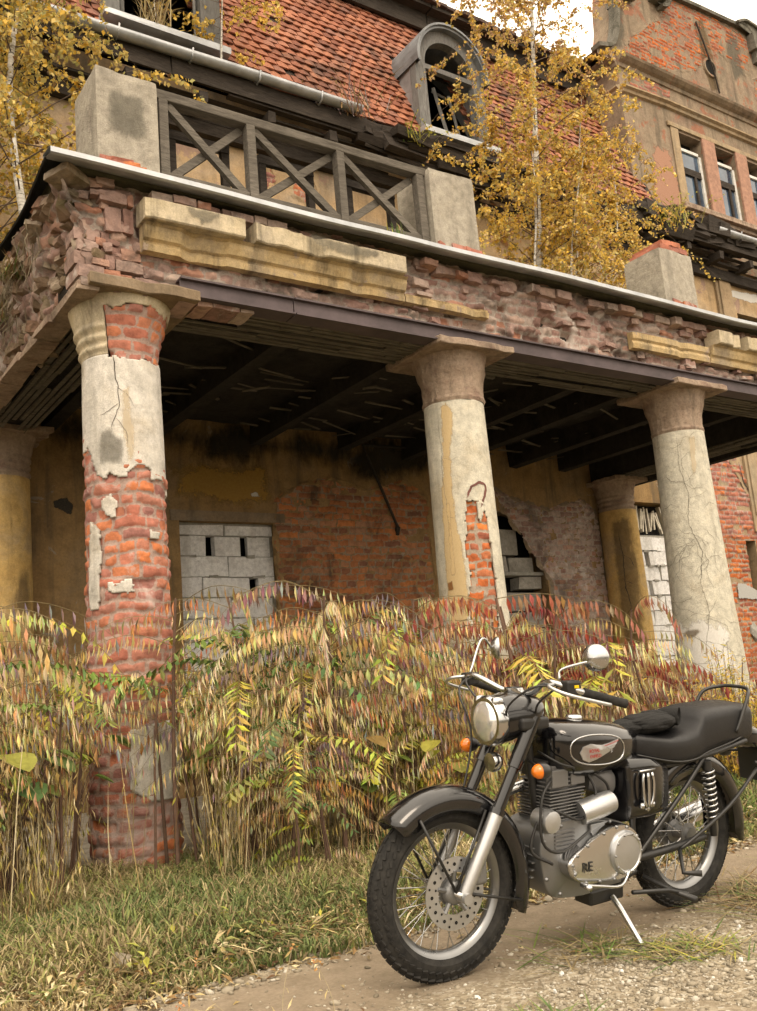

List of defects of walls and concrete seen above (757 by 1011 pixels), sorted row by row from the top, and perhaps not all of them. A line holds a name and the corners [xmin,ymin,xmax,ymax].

flaking render [629,78,670,101]
flaking render [623,1,750,76]
spalling [0,161,111,425]
crack [102,357,133,444]
flaking render [103,303,167,366]
flaking render [53,439,184,870]
flaking render [271,403,618,686]
flaking render [710,458,757,682]